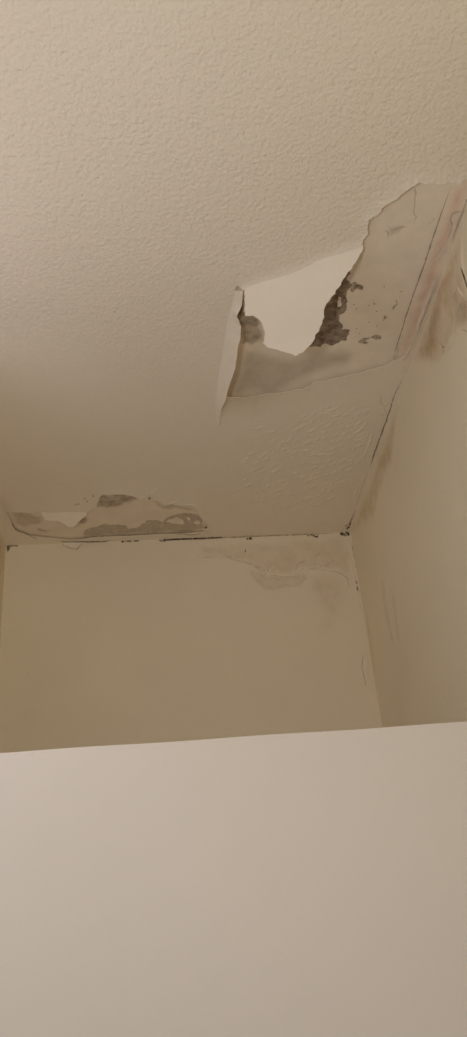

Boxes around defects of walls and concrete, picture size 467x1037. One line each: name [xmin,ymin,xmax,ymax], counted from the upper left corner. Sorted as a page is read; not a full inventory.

peeling [215,159,467,428]